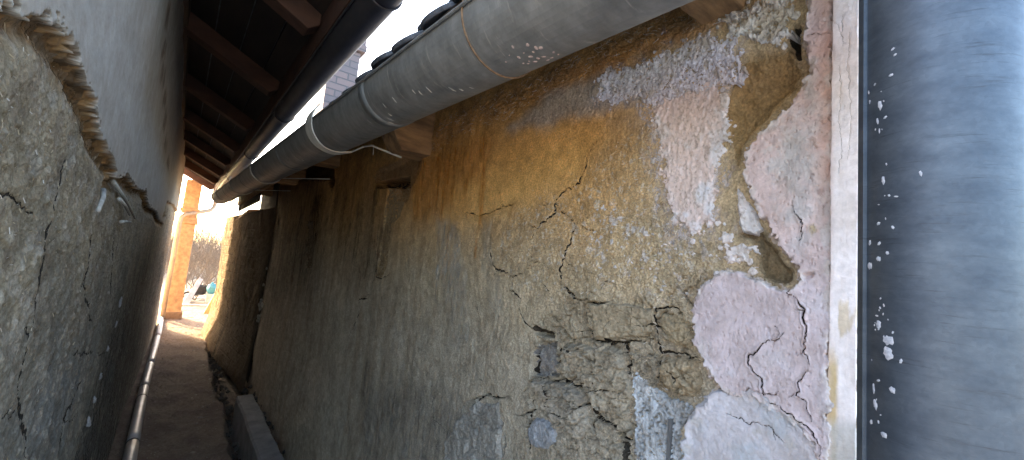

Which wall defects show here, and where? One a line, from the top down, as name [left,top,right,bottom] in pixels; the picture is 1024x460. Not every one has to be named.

peeling [0,0,185,224]
crack [0,144,69,458]
crack [59,382,81,447]
crack [81,235,119,323]
crack [459,141,697,455]
peeling [586,0,834,460]
crack [726,291,821,456]